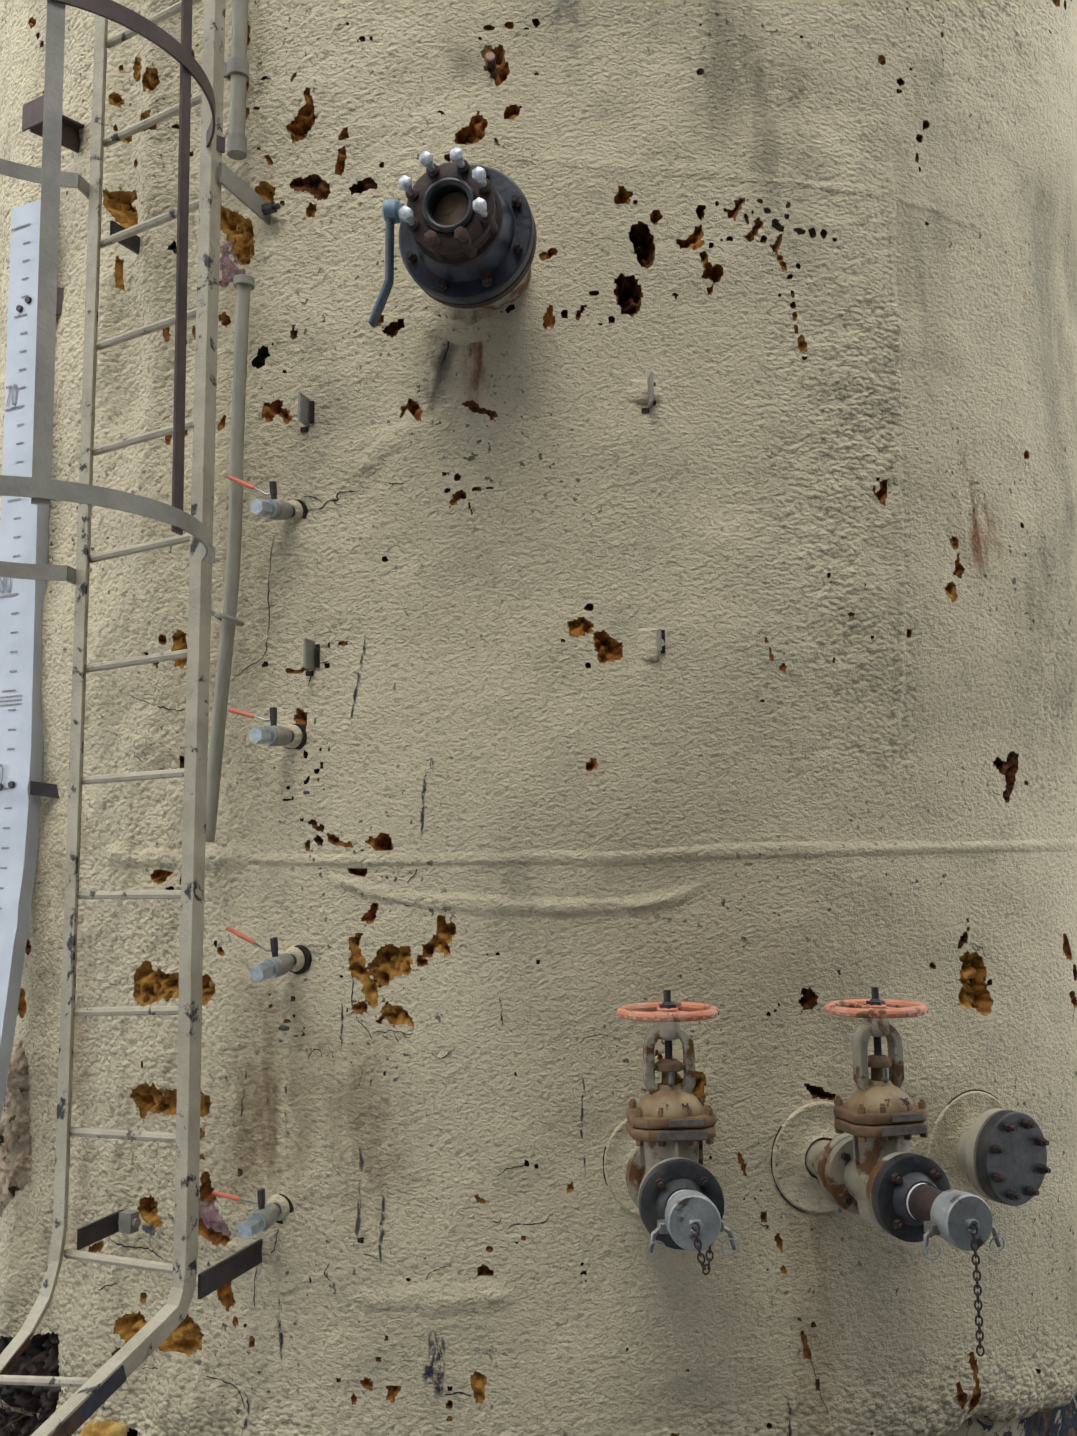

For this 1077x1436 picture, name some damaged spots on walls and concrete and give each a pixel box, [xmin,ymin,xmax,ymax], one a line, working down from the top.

hole [0,1332,61,1436]